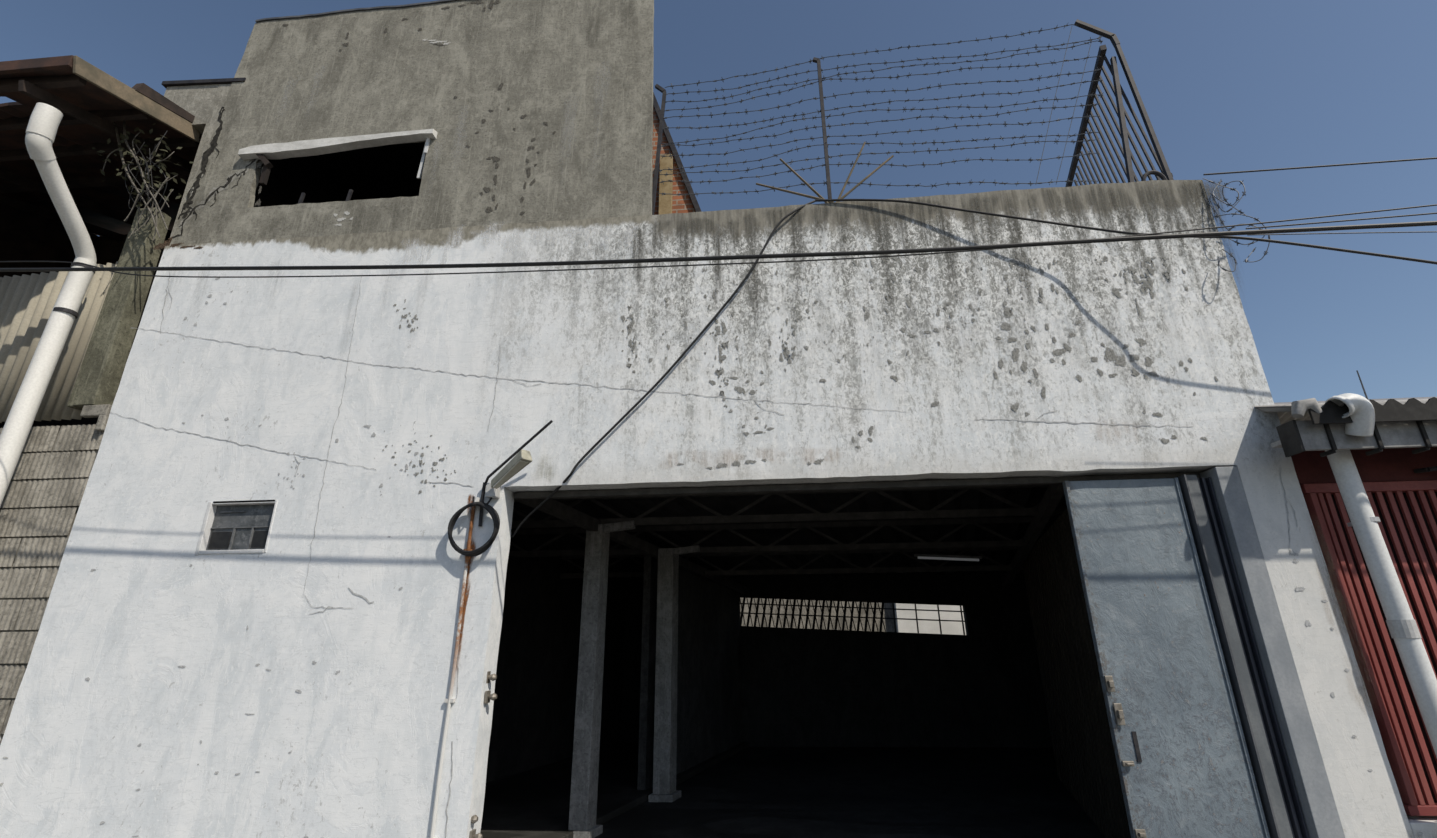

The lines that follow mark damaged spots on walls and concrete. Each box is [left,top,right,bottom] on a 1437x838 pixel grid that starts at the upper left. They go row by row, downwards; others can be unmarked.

crack [172,107,258,238]
water stain [680,200,954,287]
water stain [1032,183,1234,266]
crack [110,273,910,614]
corrosion [456,540,475,668]